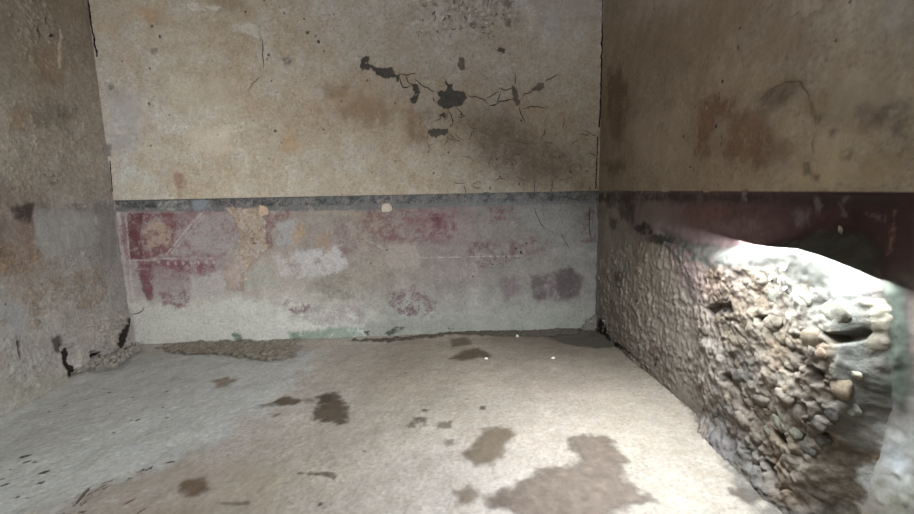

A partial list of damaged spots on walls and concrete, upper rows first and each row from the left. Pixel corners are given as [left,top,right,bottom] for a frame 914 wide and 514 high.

spalling [357,53,422,105]
spalling [426,77,469,140]
crack [399,0,604,260]
peeling [224,205,269,291]
water stain [314,393,348,424]
water stain [465,427,513,463]
water stain [490,435,653,514]
flaking render [647,226,910,514]